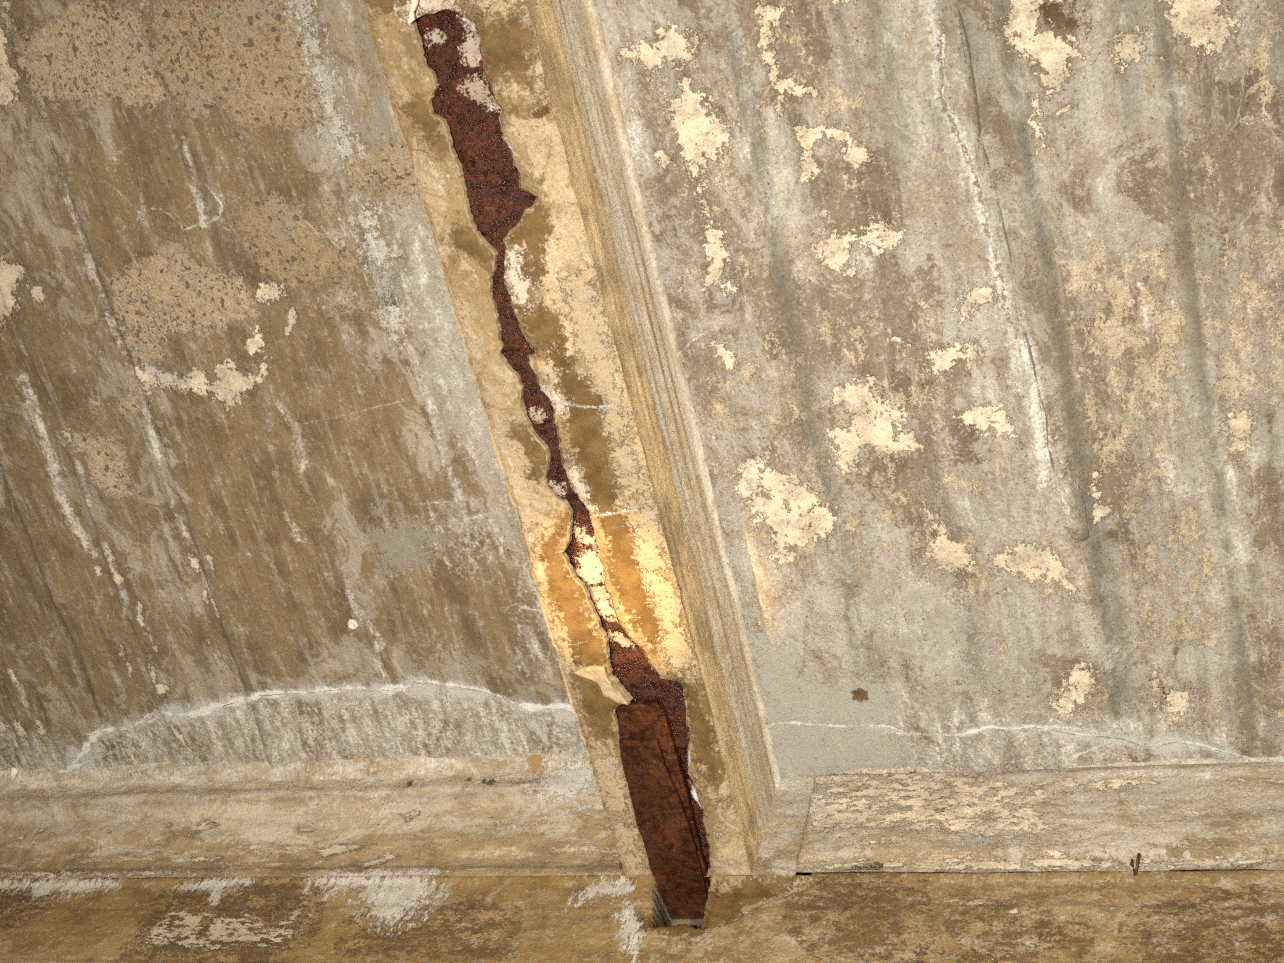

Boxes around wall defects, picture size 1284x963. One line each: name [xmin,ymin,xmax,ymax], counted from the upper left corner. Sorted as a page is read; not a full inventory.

peeling [752,0,880,187]
peeling [991,0,1086,157]
damp [1036,0,1092,39]
peeling [1103,0,1248,73]
peeling [612,16,741,298]
peeling [0,255,49,342]
peeling [807,213,911,278]
spalling [411,8,712,919]
peeling [729,446,841,569]
peeling [821,373,930,484]
damp [864,559,1002,714]
rust [523,753,552,778]